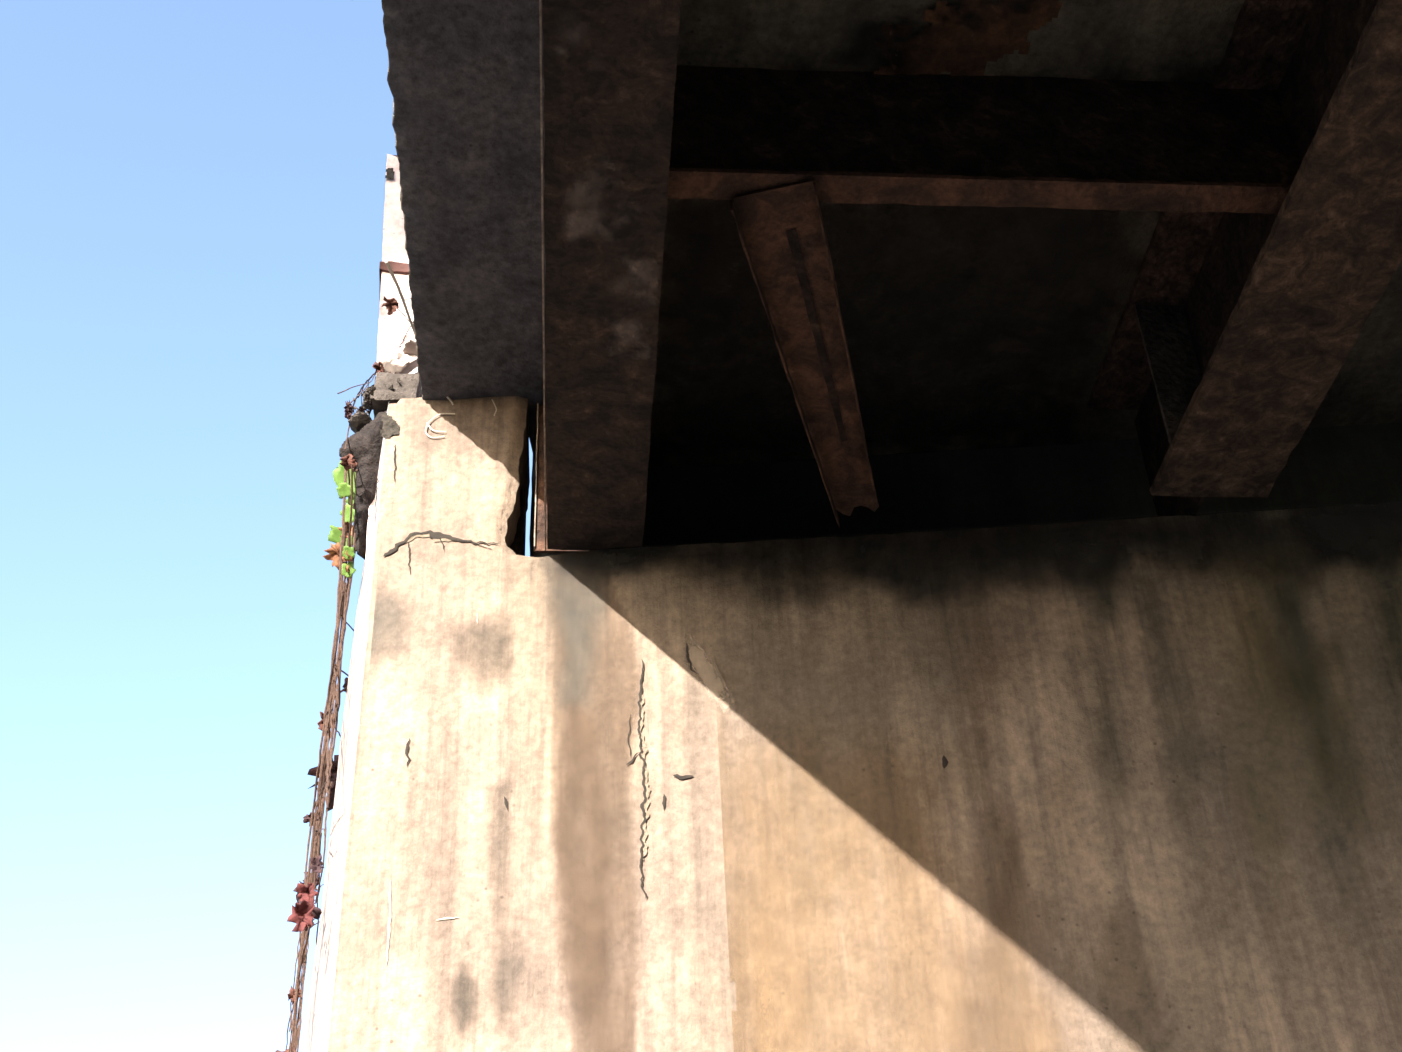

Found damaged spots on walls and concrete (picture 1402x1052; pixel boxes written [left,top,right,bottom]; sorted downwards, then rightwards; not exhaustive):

crack [375,444,499,575]
crack [626,660,651,899]